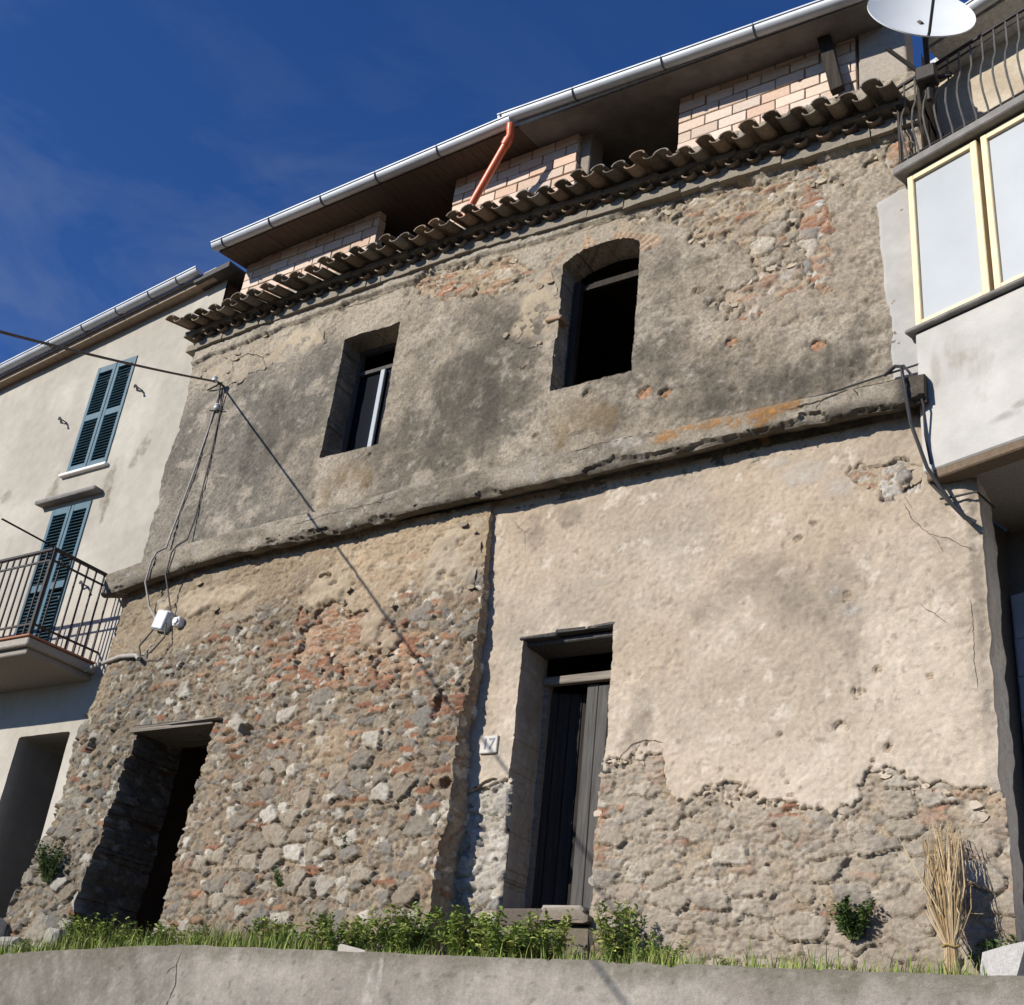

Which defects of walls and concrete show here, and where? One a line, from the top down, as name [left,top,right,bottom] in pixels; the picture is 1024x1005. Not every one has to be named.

spalling [415,257,561,368]
spalling [660,163,847,321]
spalling [847,460,924,504]
flaking render [296,600,424,691]
spalling [455,778,515,931]
spalling [588,743,1018,975]